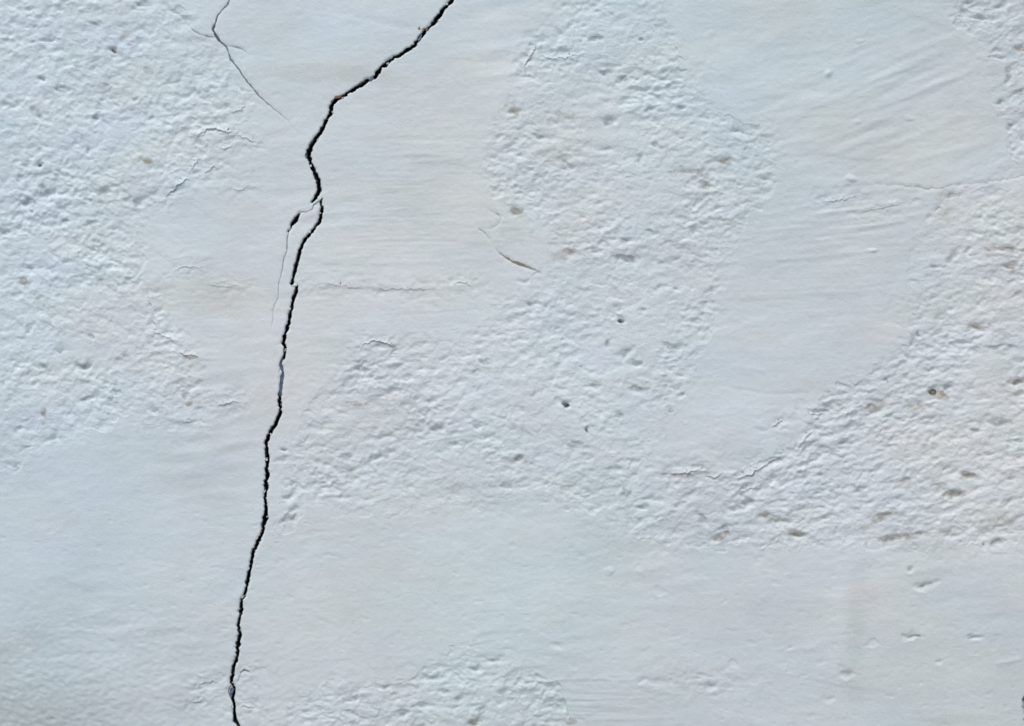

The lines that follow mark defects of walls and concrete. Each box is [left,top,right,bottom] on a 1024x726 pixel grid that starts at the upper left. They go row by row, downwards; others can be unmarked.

crack [212,2,250,85]
crack [229,0,454,726]